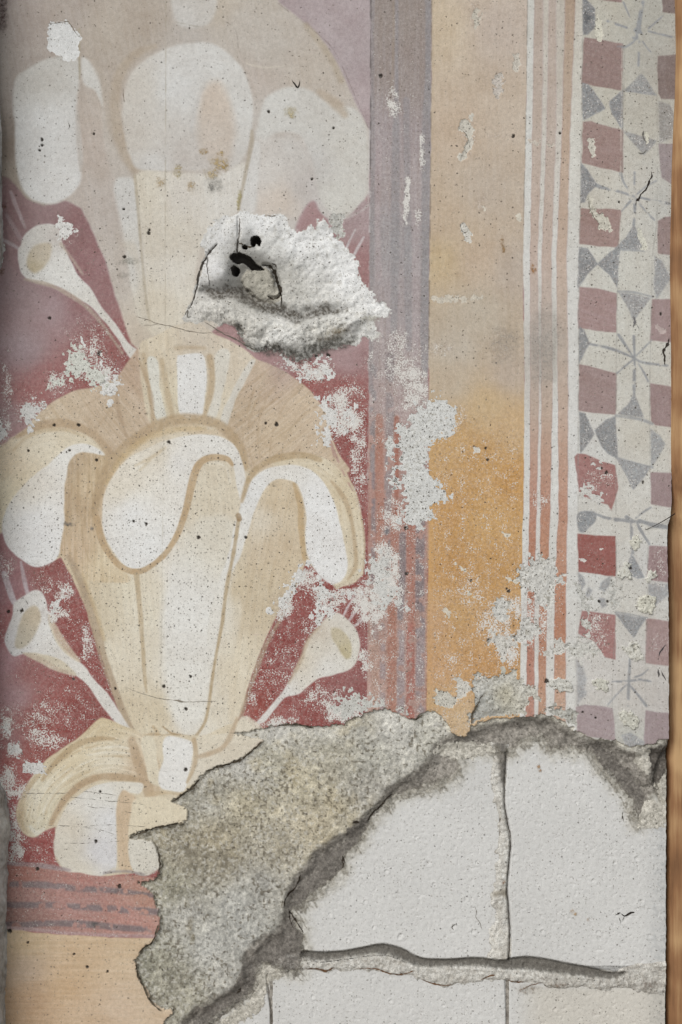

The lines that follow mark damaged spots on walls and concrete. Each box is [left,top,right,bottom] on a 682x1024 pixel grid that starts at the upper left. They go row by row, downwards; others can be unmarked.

flaking render [47,19,82,62]
peeling [18,336,124,434]
peeling [382,390,458,531]
flaking render [130,548,667,1024]